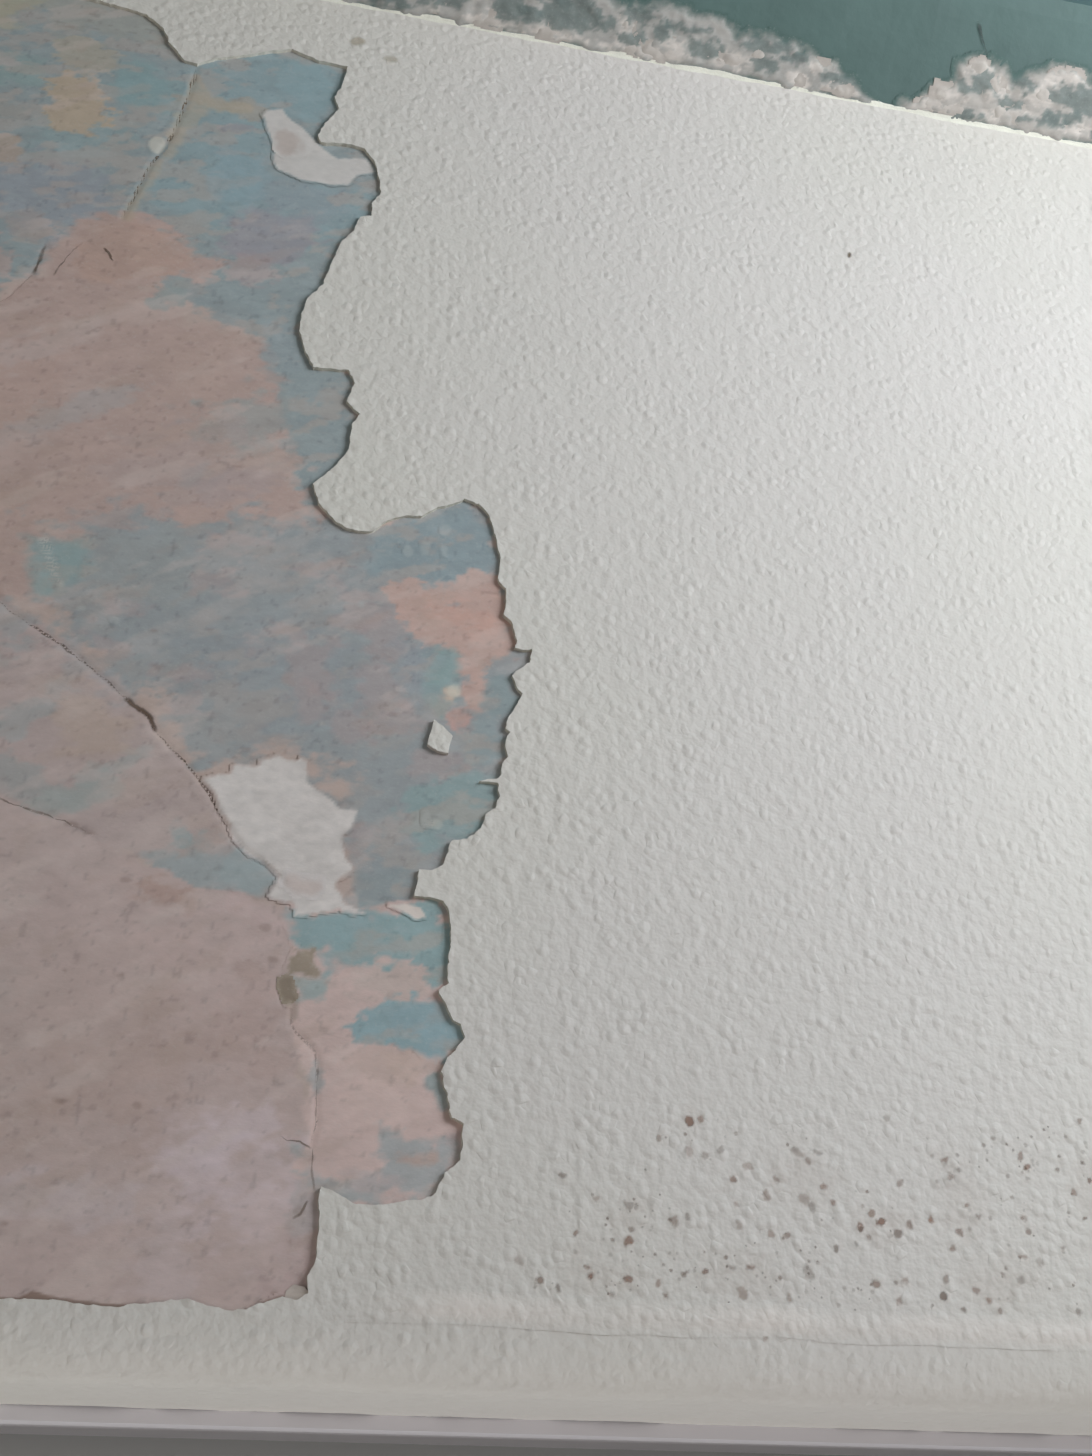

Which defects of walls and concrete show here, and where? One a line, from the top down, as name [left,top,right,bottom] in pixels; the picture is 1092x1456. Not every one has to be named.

crack [30,625,156,730]
peeling [0,0,531,1311]